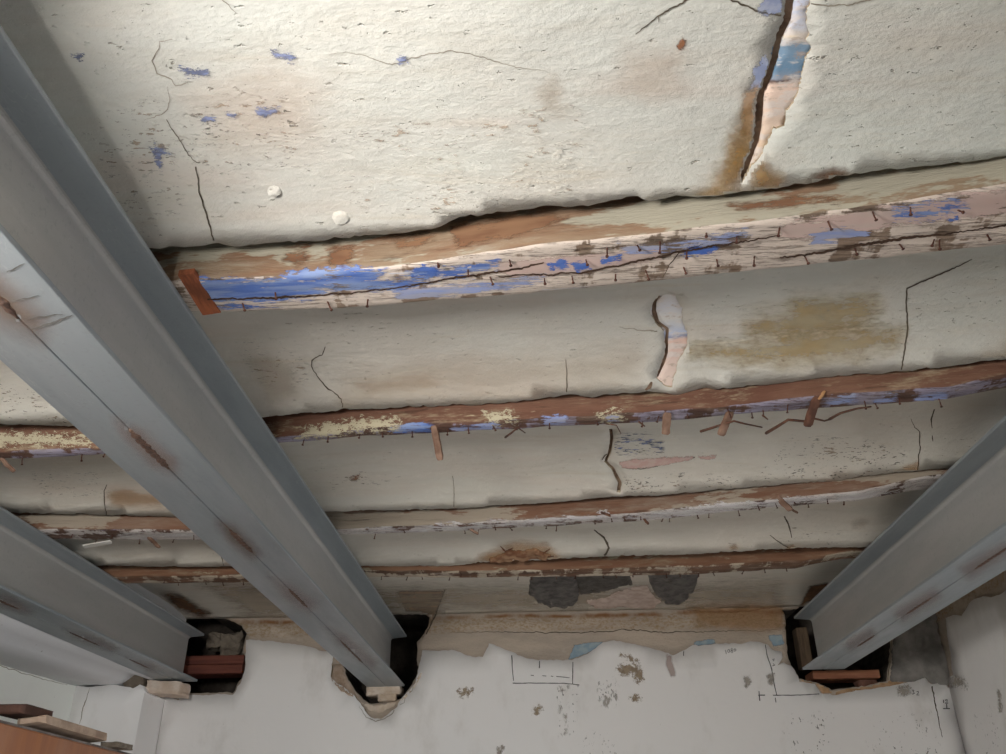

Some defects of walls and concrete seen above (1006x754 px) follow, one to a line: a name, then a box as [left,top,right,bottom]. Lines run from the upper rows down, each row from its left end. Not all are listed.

crack [636,0,687,34]
crack [332,50,542,71]
crack [730,0,870,178]
crack [145,39,214,241]
water stain [709,126,749,192]
water stain [753,164,779,187]
crack [901,259,972,370]
crack [311,348,343,407]
spalling [164,594,211,617]
spalling [225,583,828,722]
spalling [798,639,915,695]